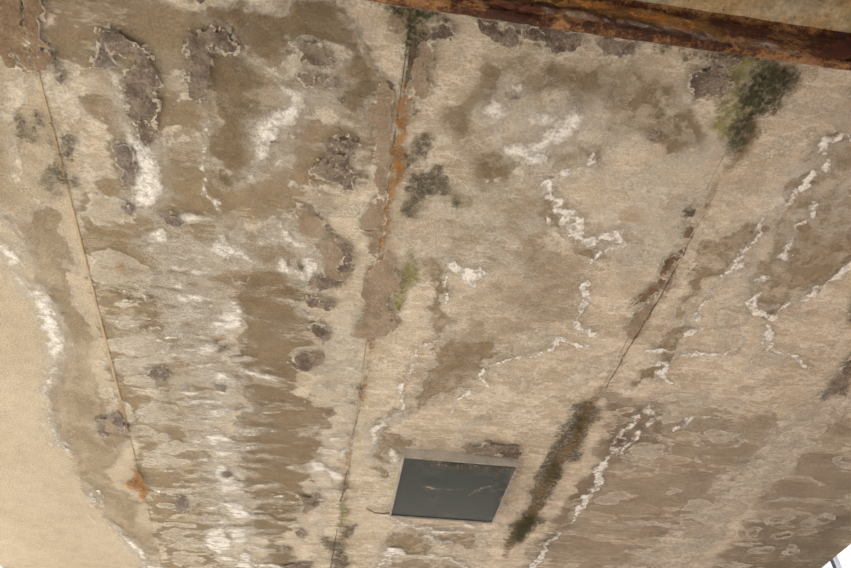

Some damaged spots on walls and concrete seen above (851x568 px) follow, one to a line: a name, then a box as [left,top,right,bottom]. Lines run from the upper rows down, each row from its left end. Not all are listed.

peeling [0,0,55,76]
spalling [89,22,164,146]
water stain [0,0,395,568]
peeling [286,78,402,373]
spalling [473,17,584,55]
water stain [476,65,731,268]
rust [544,0,741,41]
crack [605,216,704,388]
water stain [562,131,851,524]
rust [122,469,149,501]
water stain [506,401,601,568]
water stain [603,366,851,568]